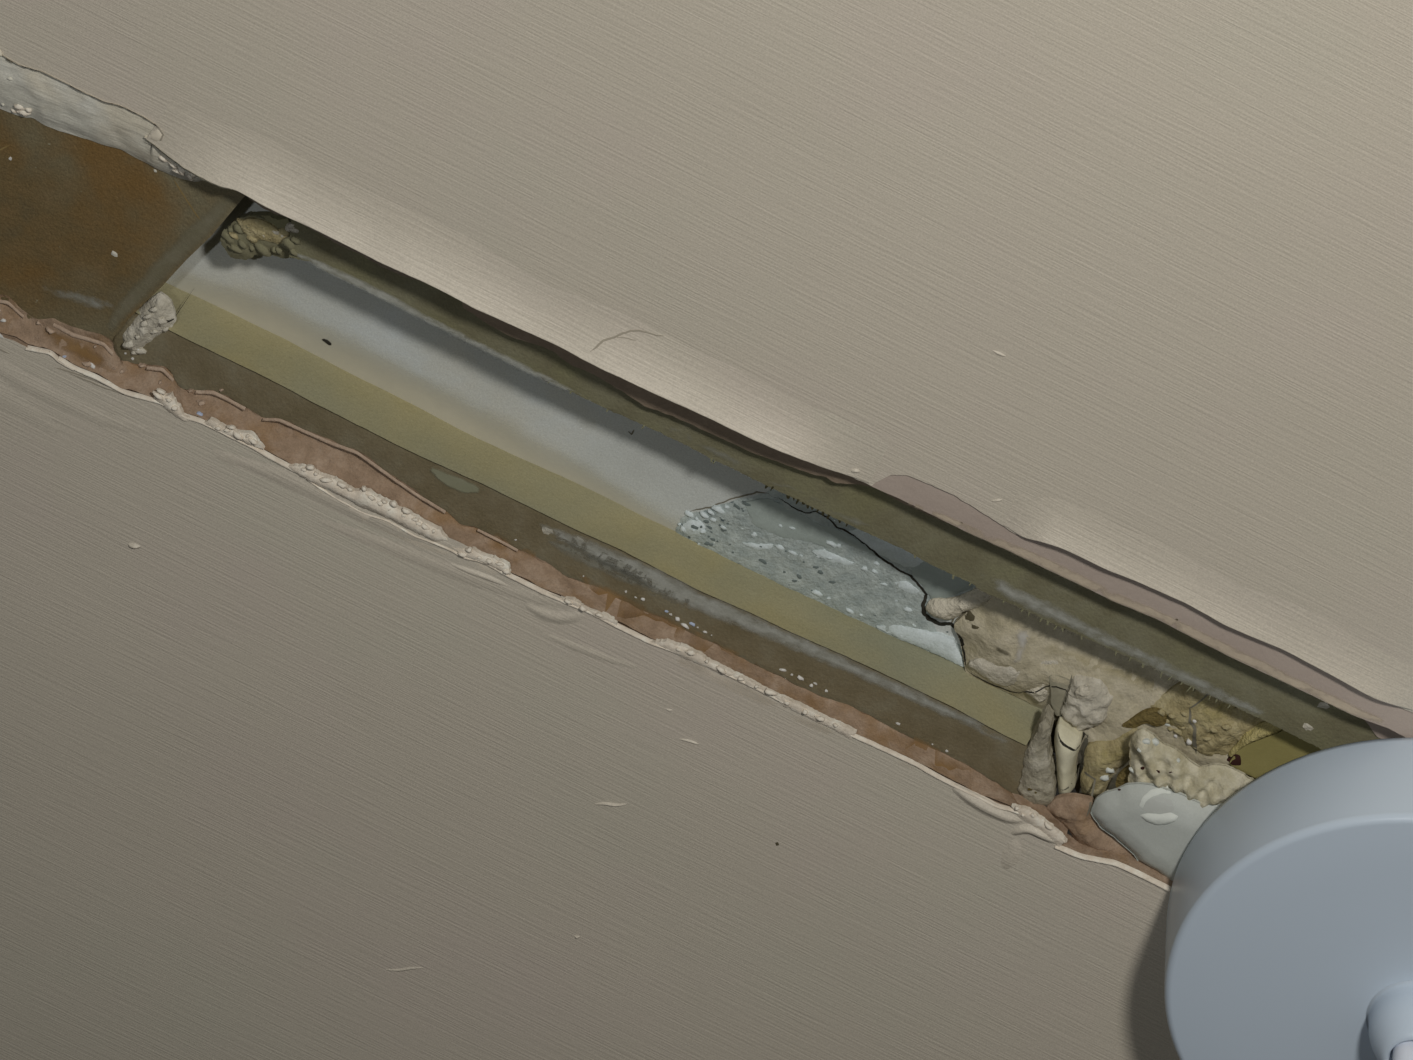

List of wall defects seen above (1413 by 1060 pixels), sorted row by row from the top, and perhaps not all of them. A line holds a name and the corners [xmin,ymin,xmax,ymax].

spalling [0,295,1171,892]
peeling [872,475,1413,738]